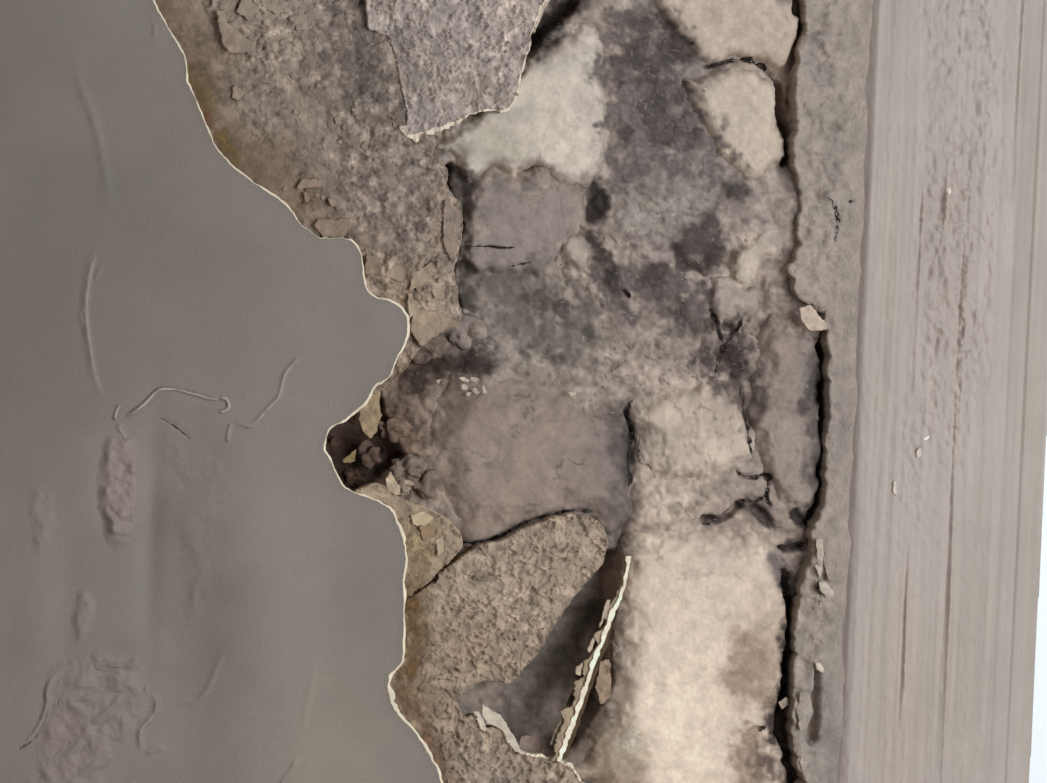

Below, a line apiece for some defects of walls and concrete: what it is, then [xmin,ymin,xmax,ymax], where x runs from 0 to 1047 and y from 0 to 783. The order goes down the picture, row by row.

water stain [447,0,767,424]
spalling [153,0,608,783]
water stain [406,350,494,394]
crack [709,309,743,373]
water stain [703,499,770,527]
crack [701,388,773,525]
spalling [778,0,835,783]
peeling [595,659,611,704]